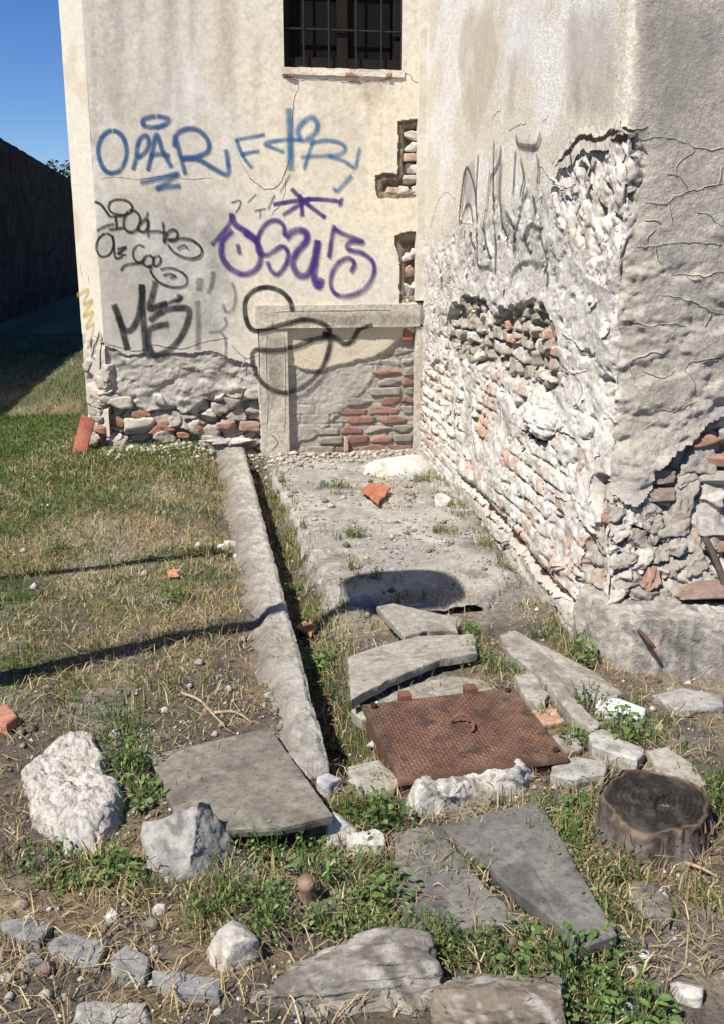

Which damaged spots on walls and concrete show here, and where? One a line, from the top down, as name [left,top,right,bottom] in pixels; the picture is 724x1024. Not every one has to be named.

flaking render [82,343,262,455]
crack [238,72,418,212]
flaking render [374,119,417,199]
flaking render [290,230,564,453]
spalling [539,133,648,308]
crack [535,114,724,429]
flaking render [572,417,724,605]